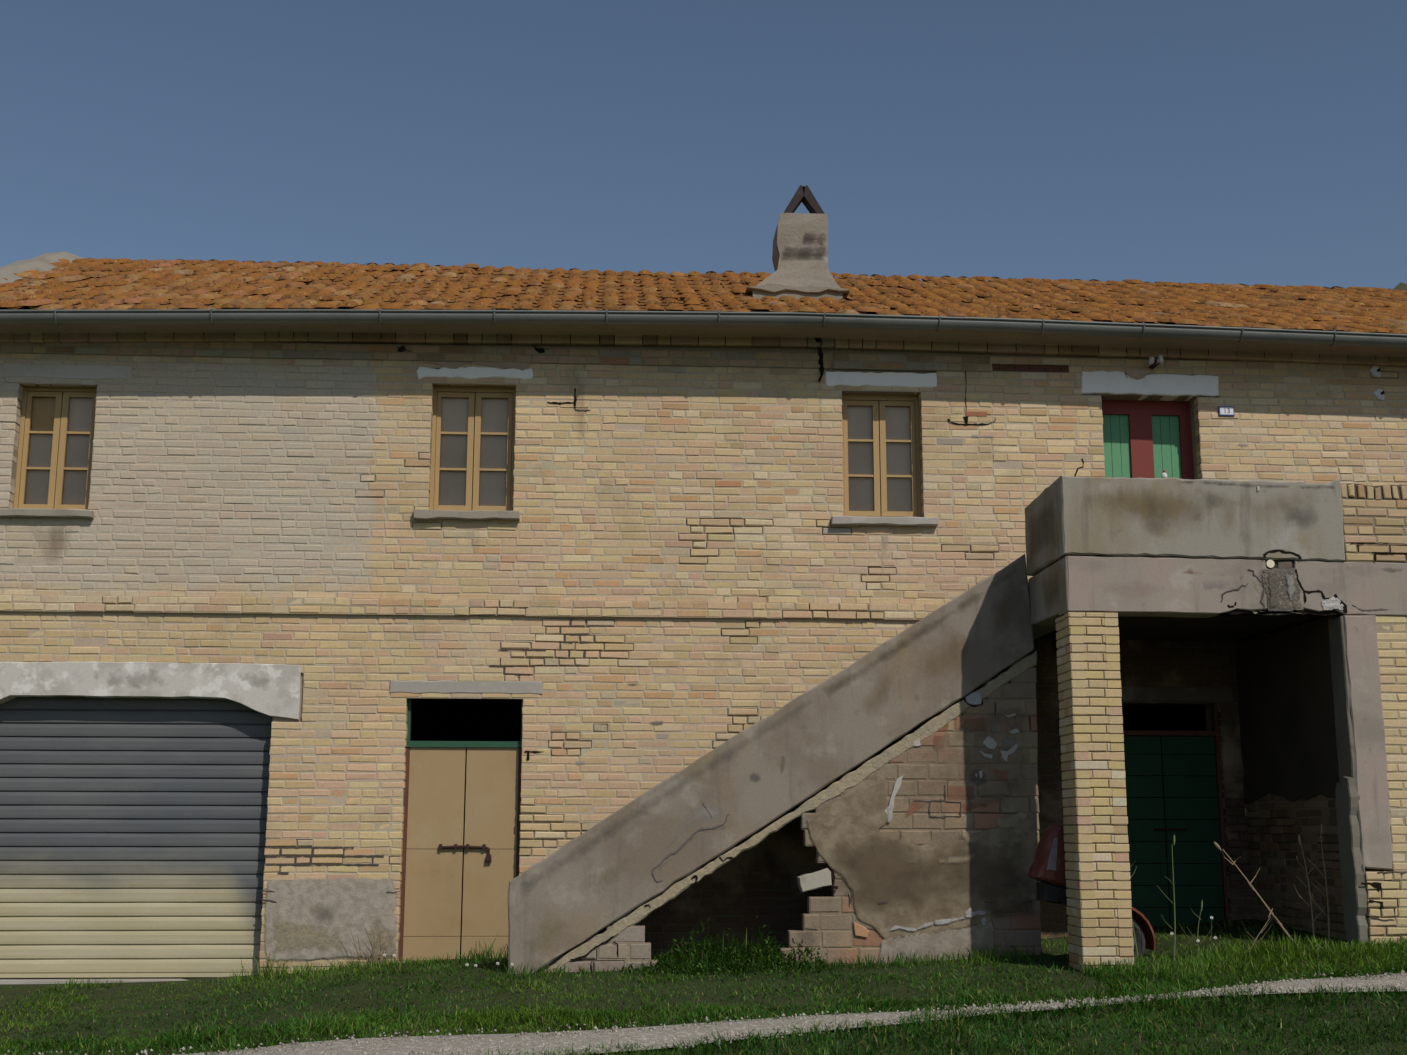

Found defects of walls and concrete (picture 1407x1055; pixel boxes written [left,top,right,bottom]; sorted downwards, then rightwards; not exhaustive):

spalling [1215,549,1347,618]
flaking render [963,693,983,707]
peeling [980,712,1020,762]
flaking render [807,771,1037,963]